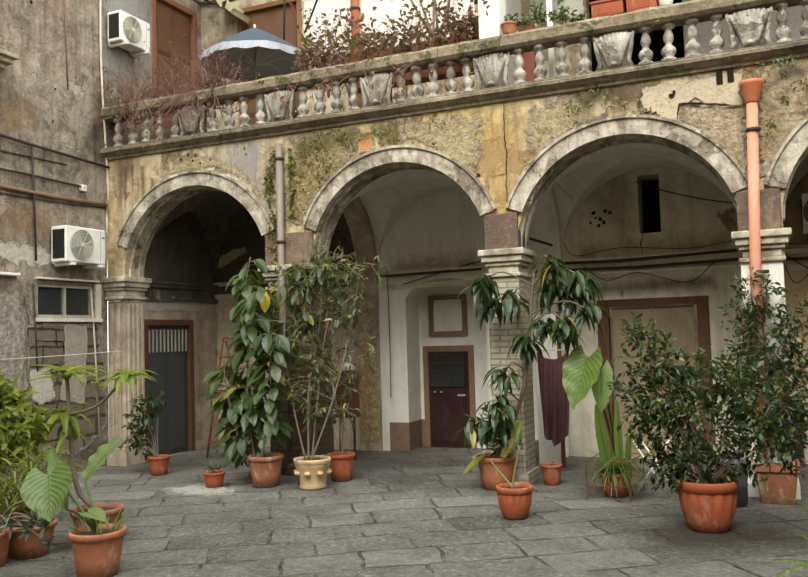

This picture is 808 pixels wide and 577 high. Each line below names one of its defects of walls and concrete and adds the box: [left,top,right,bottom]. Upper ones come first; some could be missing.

crack [495,103,508,209]
flaking render [523,93,588,156]
flaking render [679,103,747,174]
flaking render [758,65,808,181]